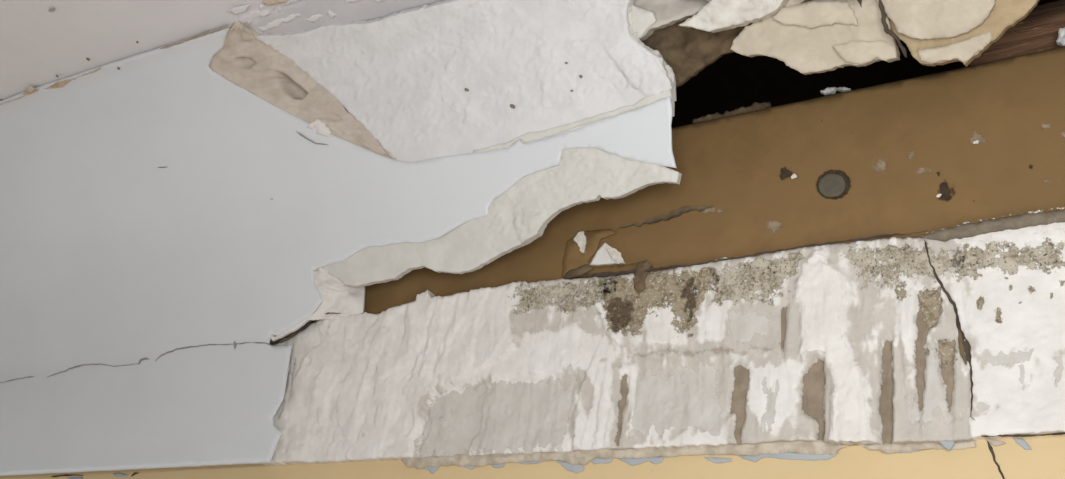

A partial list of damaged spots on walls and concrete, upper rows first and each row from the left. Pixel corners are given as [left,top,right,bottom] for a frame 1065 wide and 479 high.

flaking render [161,0,762,162]
flaking render [261,148,1065,474]
water stain [895,281,907,300]
water stain [919,286,943,328]
crack [0,312,340,383]
crack [566,230,1065,479]
water stain [923,339,958,369]